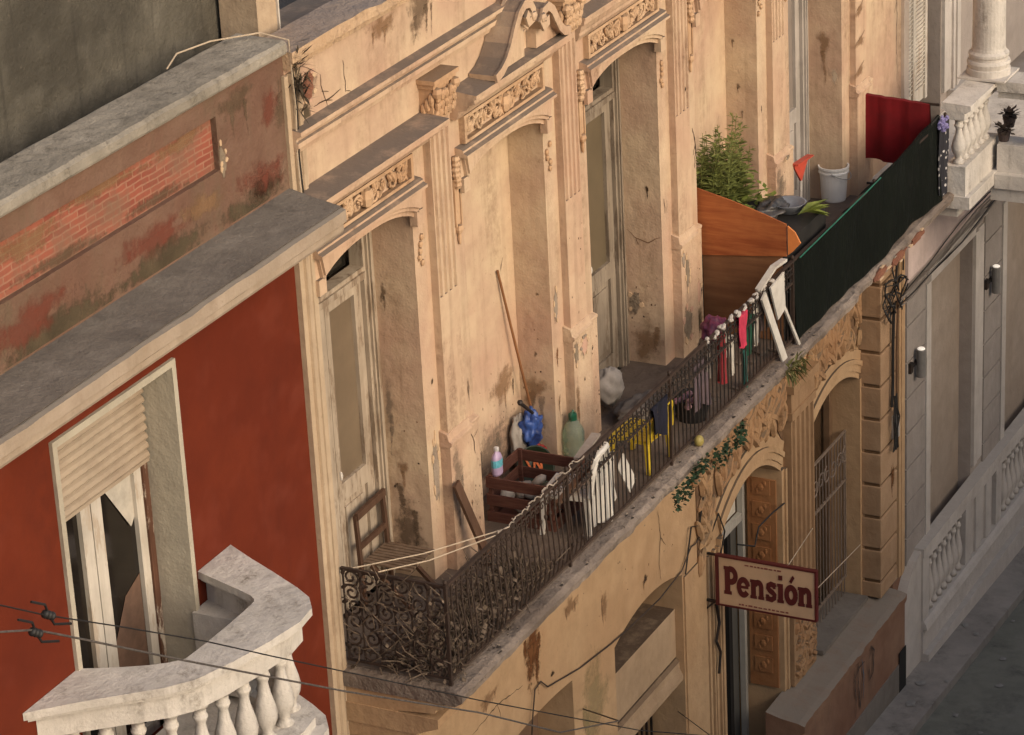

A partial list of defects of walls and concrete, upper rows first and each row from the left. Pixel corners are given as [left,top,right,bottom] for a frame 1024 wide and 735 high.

crack [314,62,350,107]
water stain [224,158,281,223]
water stain [495,367,511,404]
water stain [395,464,419,546]
corrosion [523,629,541,688]